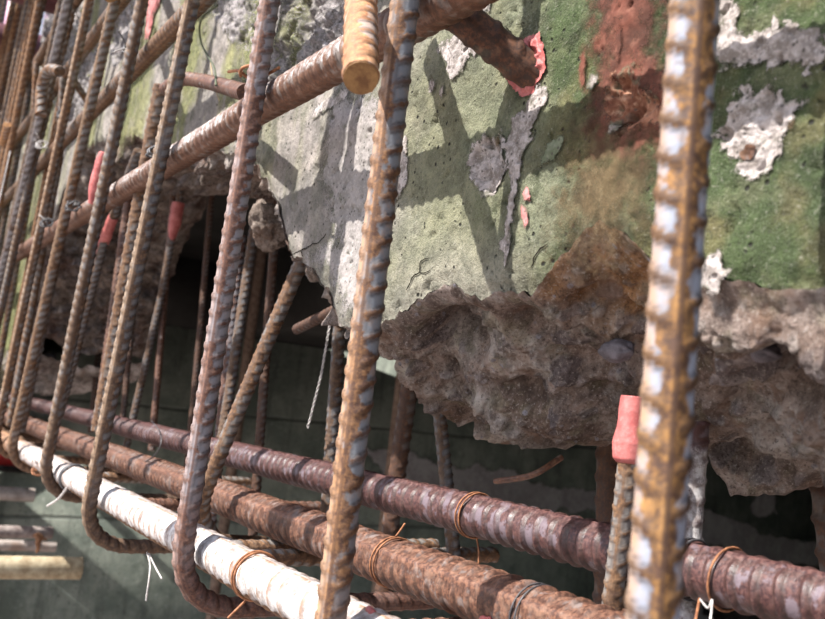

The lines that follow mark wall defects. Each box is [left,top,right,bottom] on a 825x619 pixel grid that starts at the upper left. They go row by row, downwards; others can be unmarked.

corrosion [579,0,670,151]
spalling [716,83,809,181]
damp [559,106,660,253]
spalling [215,226,257,438]
spalling [262,249,279,333]
spalling [111,415,191,454]
spalling [208,436,219,461]
spalling [224,353,333,495]
peeling [361,447,596,533]
spalling [459,494,611,575]
spalling [709,549,825,619]